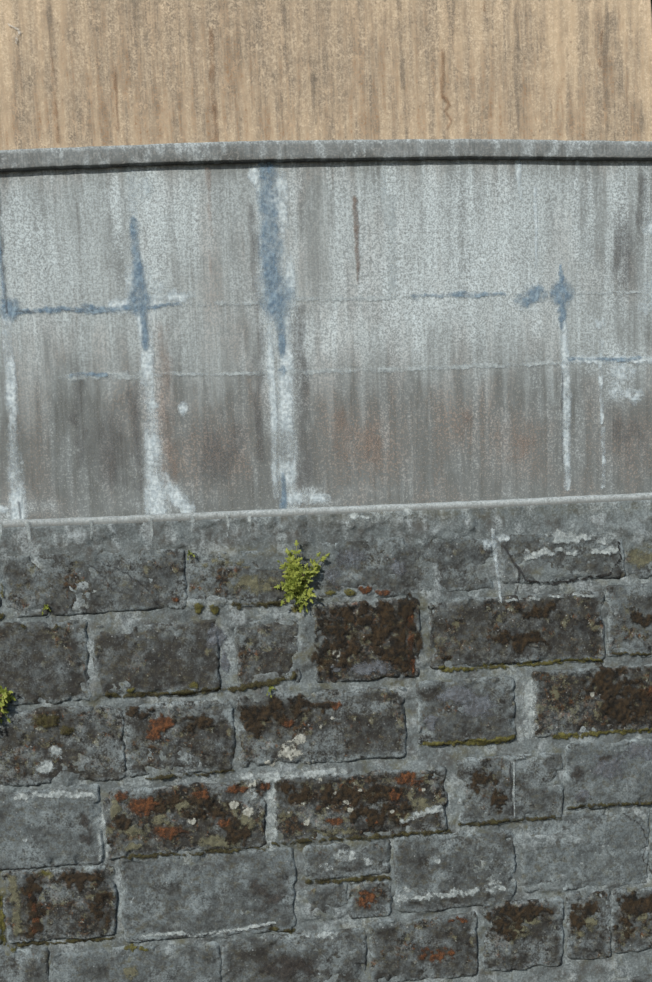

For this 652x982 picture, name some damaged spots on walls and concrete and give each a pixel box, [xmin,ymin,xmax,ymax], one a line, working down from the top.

damp [0,208,203,549]
damp [217,162,351,437]
damp [271,455,330,509]
damp [516,264,652,490]